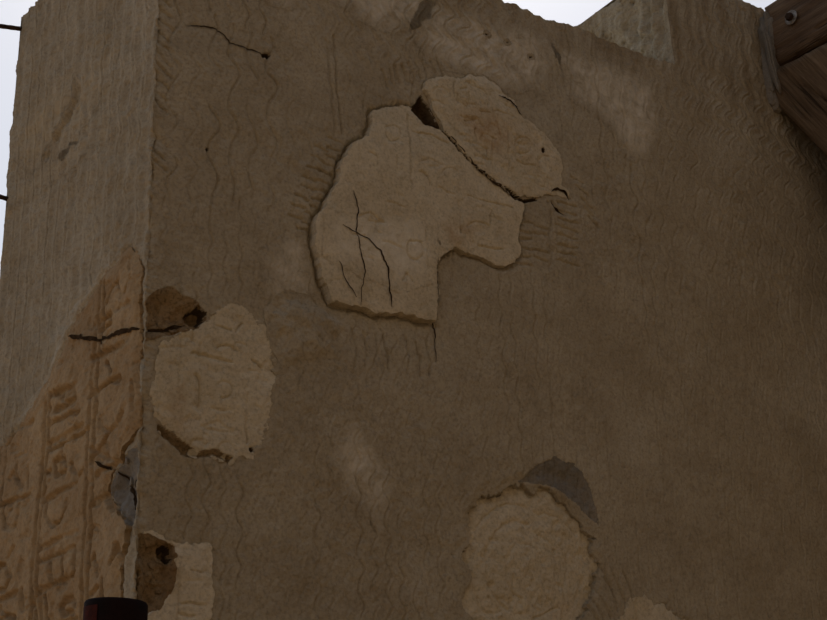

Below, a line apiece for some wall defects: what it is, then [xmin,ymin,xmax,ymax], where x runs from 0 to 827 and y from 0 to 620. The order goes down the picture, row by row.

crack [191,25,262,57]
crack [68,325,185,344]
spalling [145,287,206,341]
spalling [111,447,140,525]
spalling [136,533,178,613]